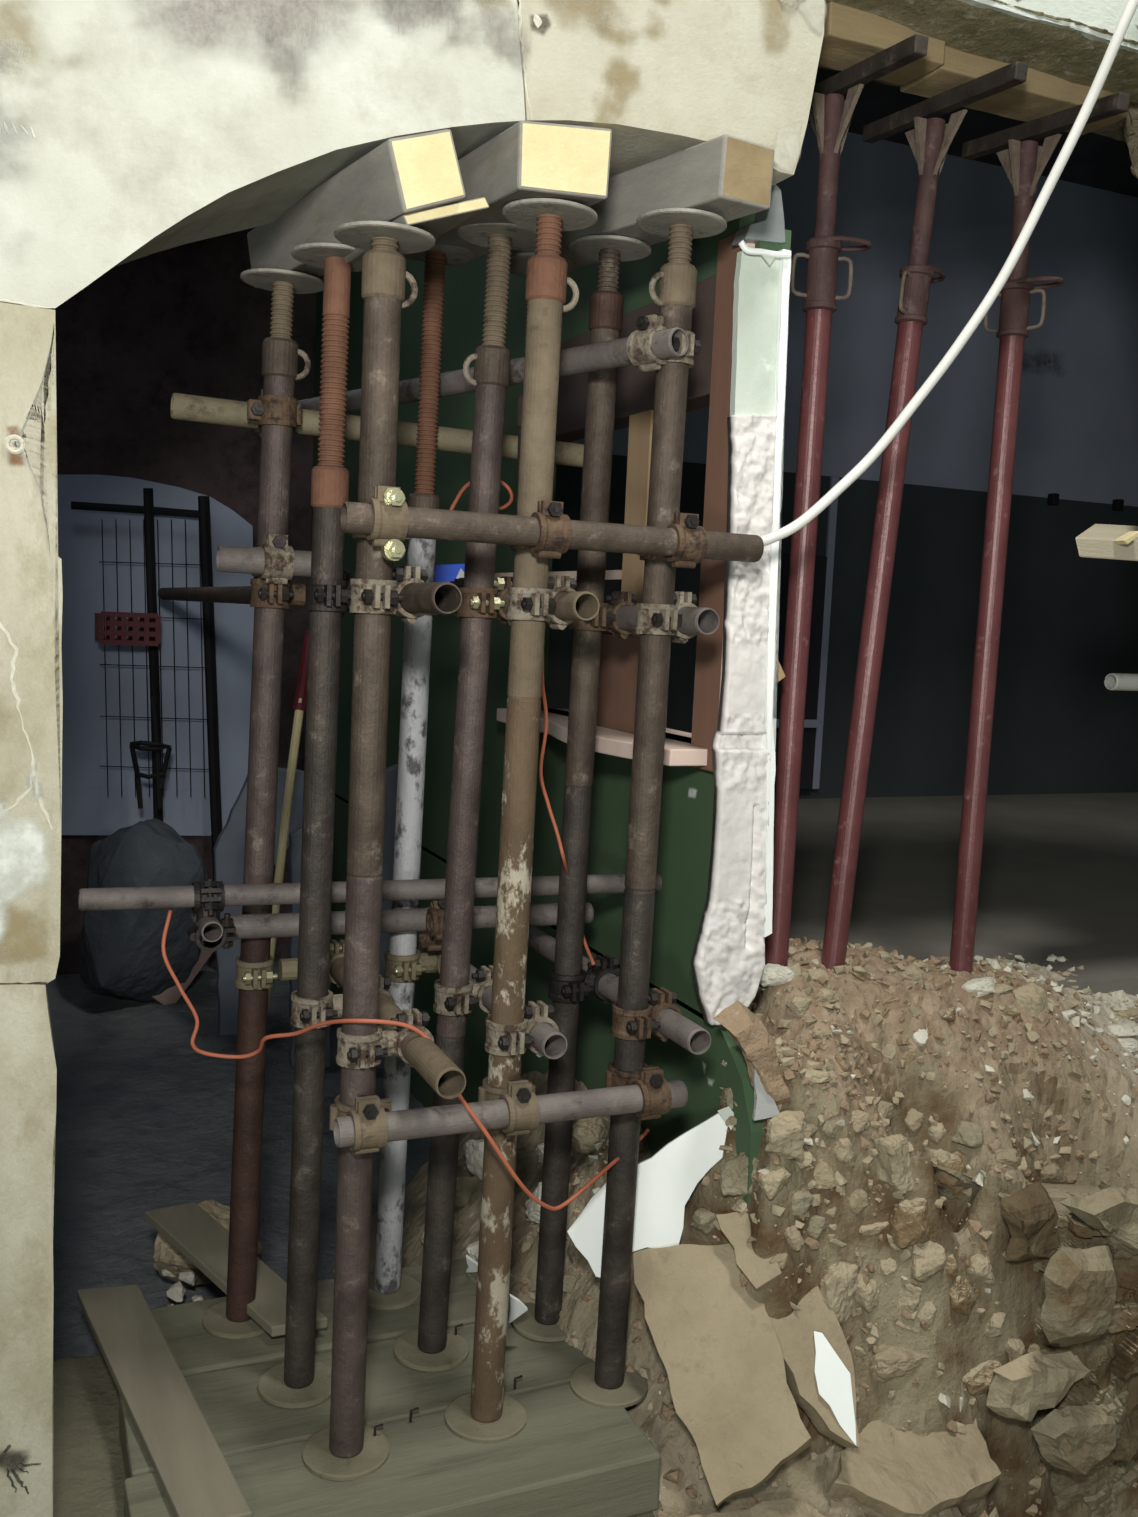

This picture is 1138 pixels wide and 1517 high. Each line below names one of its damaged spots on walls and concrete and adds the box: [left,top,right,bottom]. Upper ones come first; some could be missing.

leakage [168,0,338,41]
spalling [799,0,1138,102]
crack [0,622,53,830]